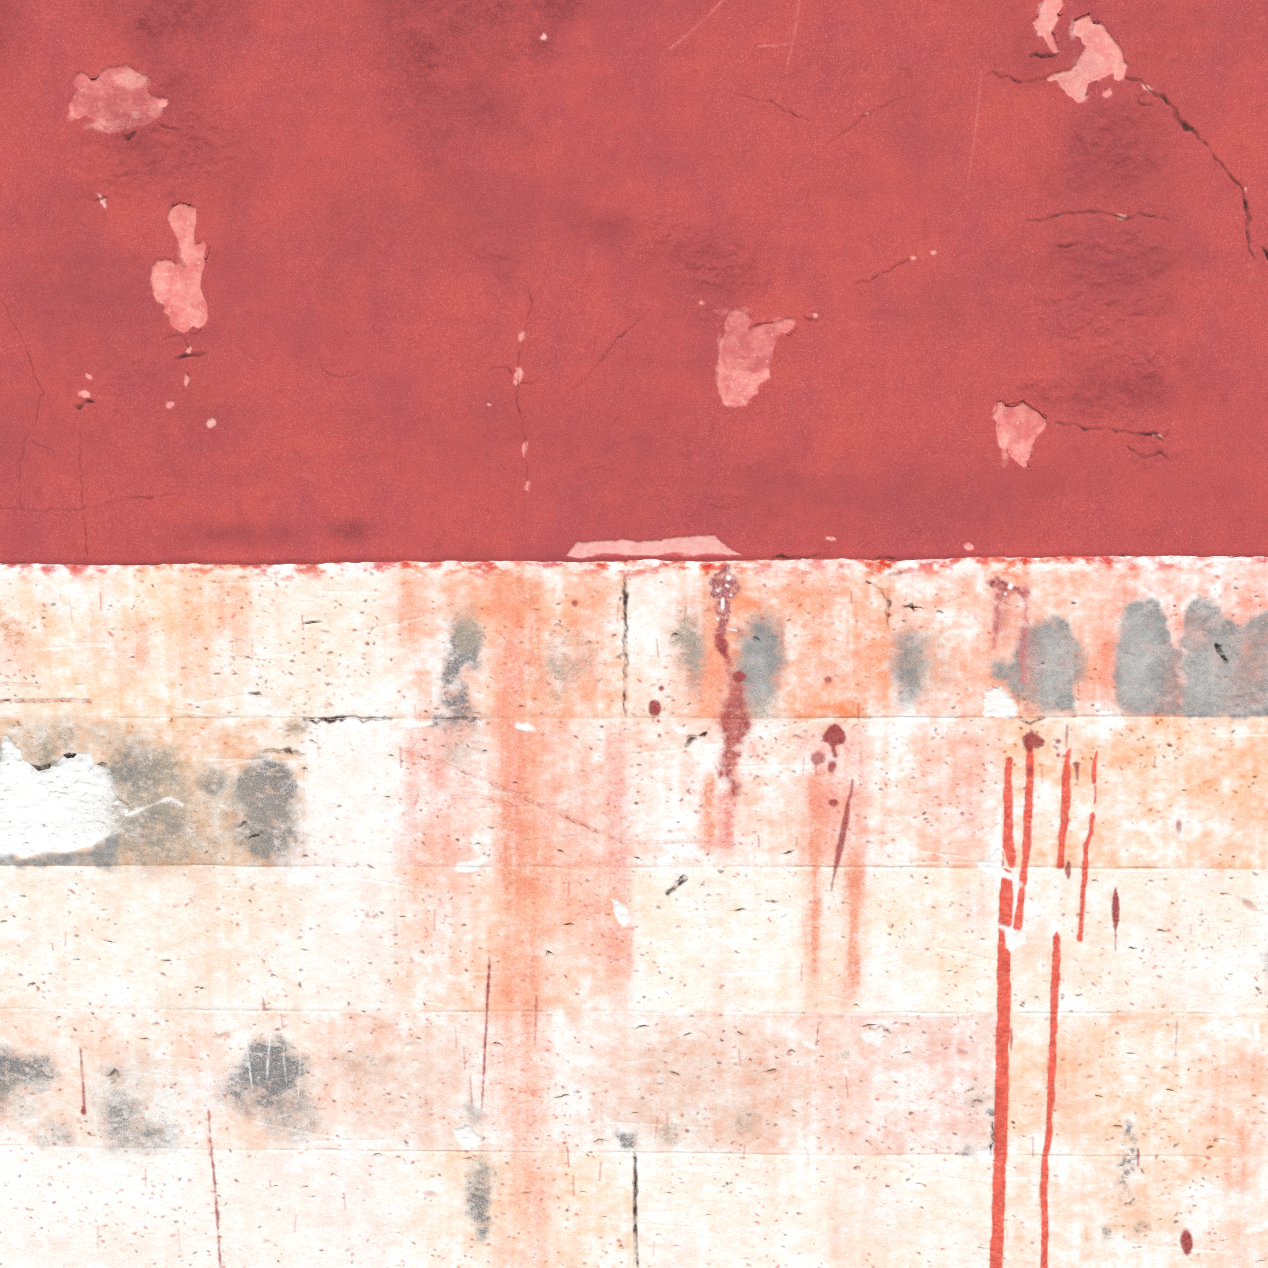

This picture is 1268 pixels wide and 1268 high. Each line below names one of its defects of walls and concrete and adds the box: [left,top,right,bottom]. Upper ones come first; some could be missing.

peeling [69,65,167,133]
peeling [1032,0,1127,102]
crack [1134,79,1268,259]
peeling [151,199,209,353]
peeling [717,309,797,405]
peeling [569,536,738,558]
leakage [432,618,482,731]
leakage [994,617,1085,710]
leakage [1113,600,1268,718]
spalling [0,735,129,867]
leakage [104,741,297,867]
leakage [226,1037,304,1119]